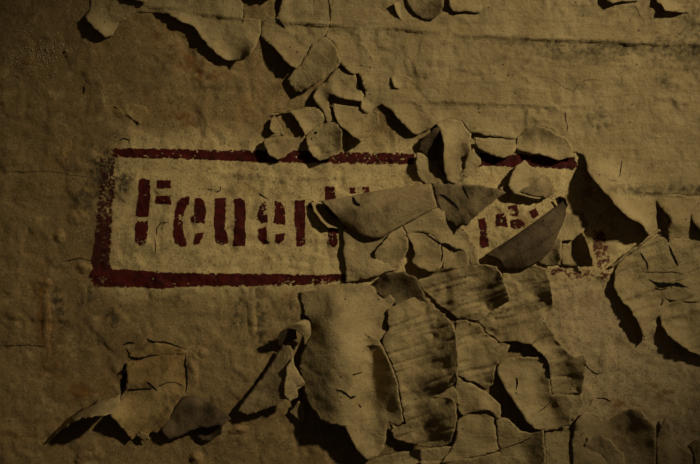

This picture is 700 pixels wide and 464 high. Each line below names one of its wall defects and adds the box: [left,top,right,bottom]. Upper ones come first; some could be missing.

peeling [85,0,341,93]
peeling [238,0,700,464]
peeling [44,337,231,444]